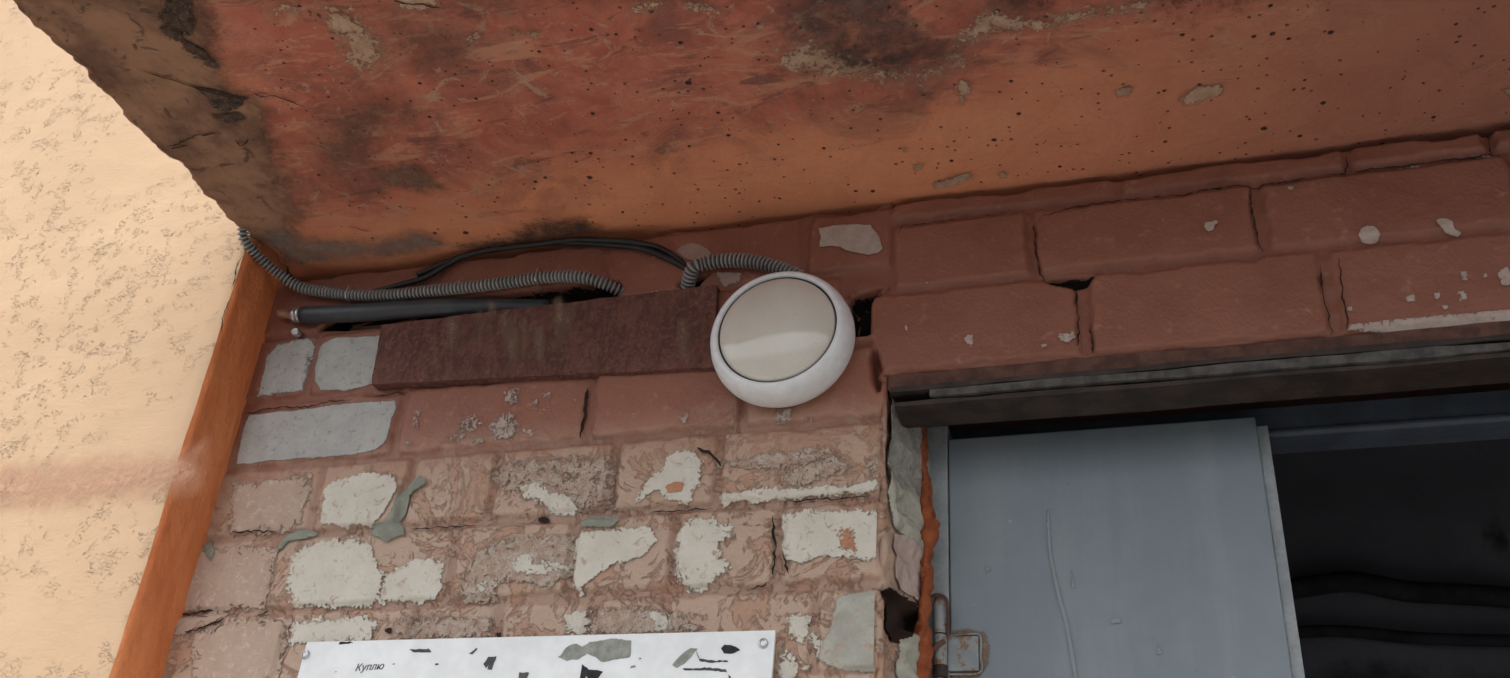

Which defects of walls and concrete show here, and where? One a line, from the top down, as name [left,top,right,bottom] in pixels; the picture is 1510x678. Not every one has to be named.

peeling [321,0,394,75]
peeling [397,0,439,10]
damp [787,0,941,78]
peeling [14,0,305,244]
peeling [818,224,883,255]
crack [900,135,1509,352]
peeling [1347,267,1510,333]
peeling [1041,331,1076,348]
peeling [173,336,933,678]